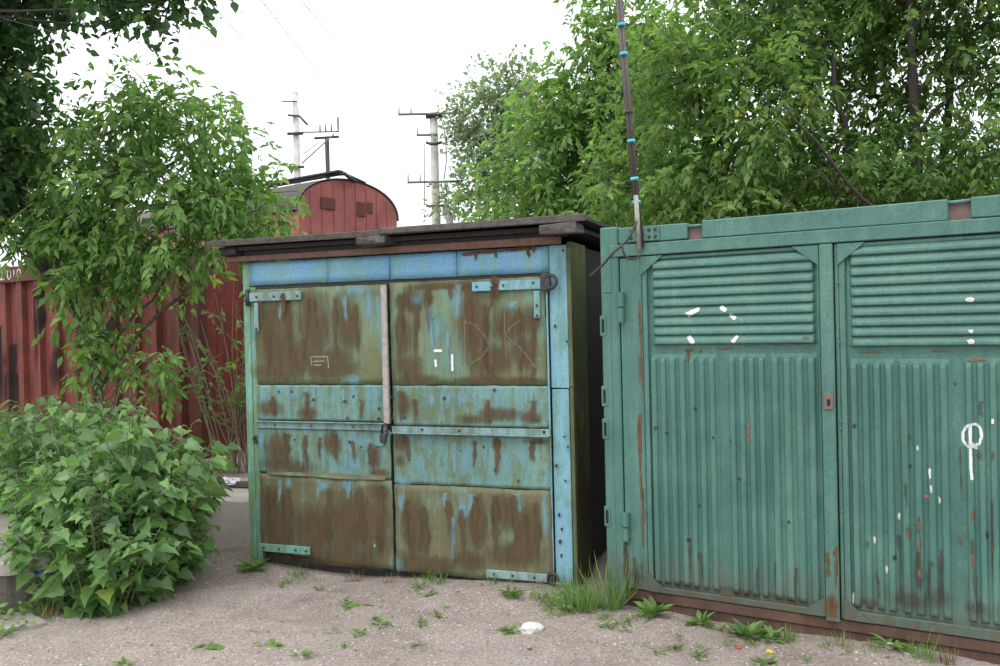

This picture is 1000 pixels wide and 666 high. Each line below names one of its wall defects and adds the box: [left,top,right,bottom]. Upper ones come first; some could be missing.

water stain [33,286,46,333]
water stain [0,327,17,383]
rust [256,293,359,381]
rust [395,276,541,419]
rust [261,396,281,415]
rust [301,392,315,421]
rust [462,400,540,423]
rust [265,433,339,473]
rust [492,438,500,473]
rust [529,439,543,460]
rust [263,444,388,567]
rust [399,495,541,574]